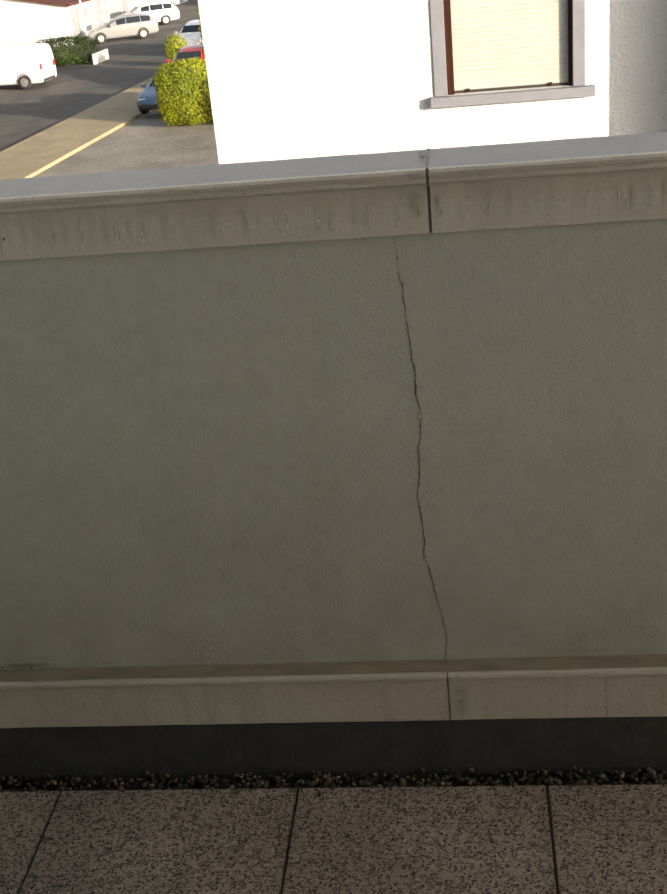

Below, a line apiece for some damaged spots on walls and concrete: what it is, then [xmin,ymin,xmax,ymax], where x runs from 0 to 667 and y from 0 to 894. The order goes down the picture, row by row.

crack [397,256,447,658]